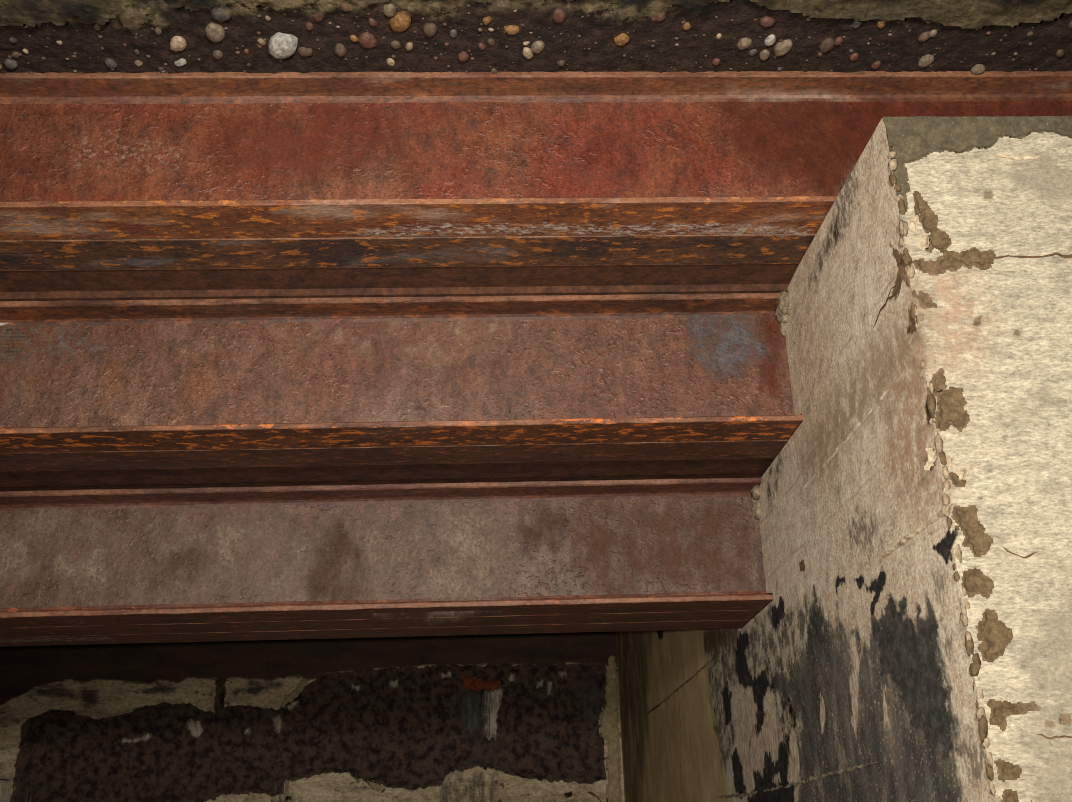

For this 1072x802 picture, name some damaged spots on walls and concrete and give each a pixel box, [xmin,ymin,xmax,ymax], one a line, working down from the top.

corrosion [723,98,903,186]
corrosion [916,105,961,117]
corrosion [978,98,1072,117]
flaking render [883,116,1072,336]
crack [993,251,1072,259]
crack [874,280,902,326]
spalling [921,359,1041,802]
flaking render [10,663,607,802]